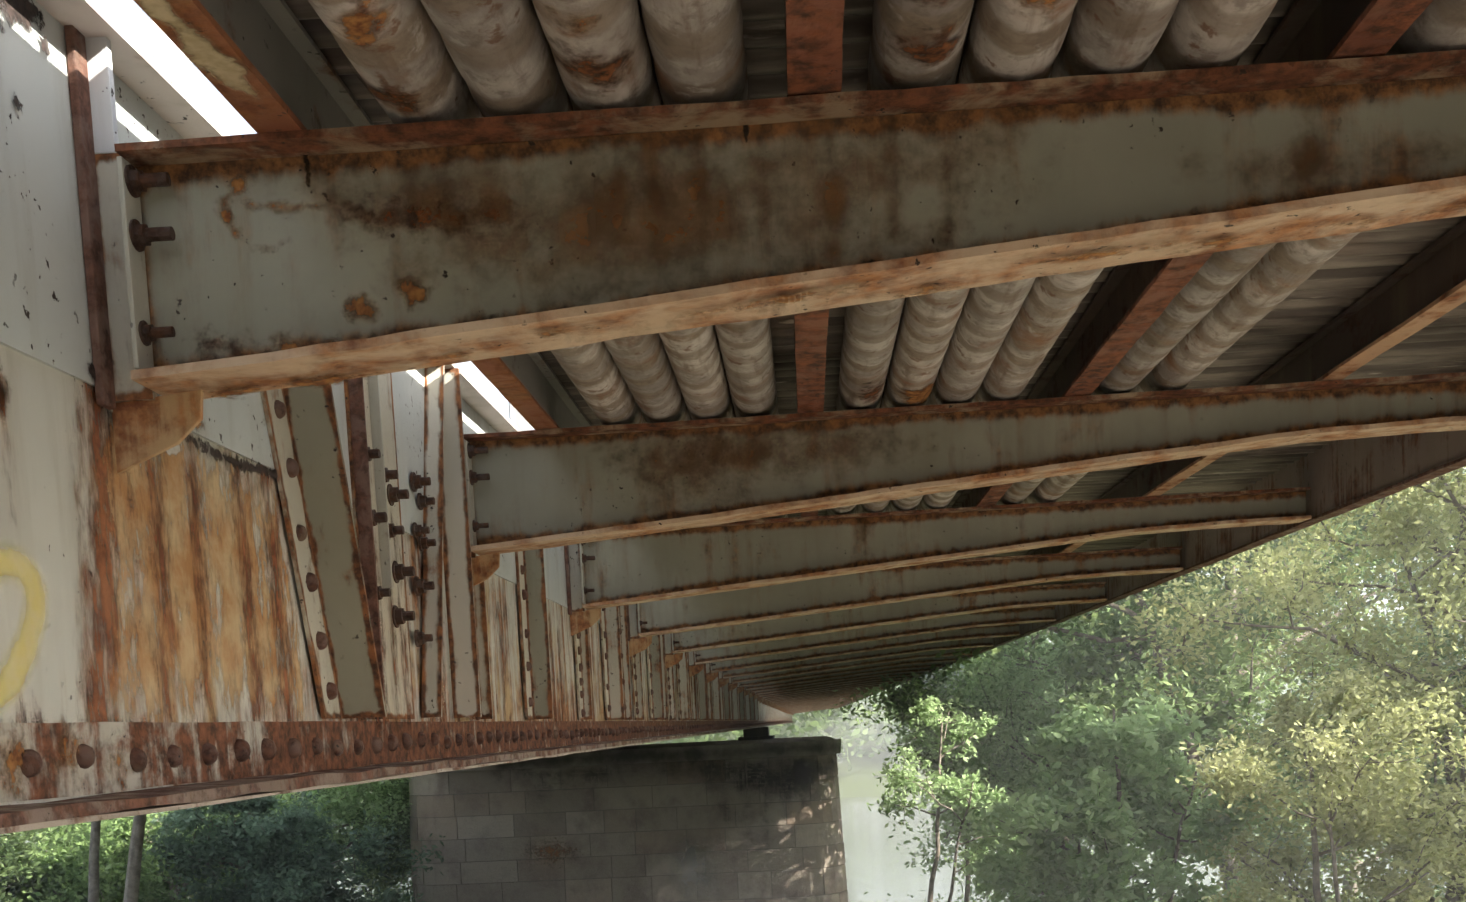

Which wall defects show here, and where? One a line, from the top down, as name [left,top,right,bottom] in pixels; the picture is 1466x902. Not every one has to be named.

corrosion [335,0,391,47]
corrosion [554,49,631,88]
corrosion [220,177,318,237]
corrosion [1040,243,1172,263]
corrosion [344,294,375,318]
corrosion [398,279,427,307]
corrosion [202,334,333,359]
corrosion [0,368,9,419]
corrosion [77,382,304,723]
corrosion [376,590,411,733]
corrosion [0,711,42,798]
corrosion [111,752,134,789]